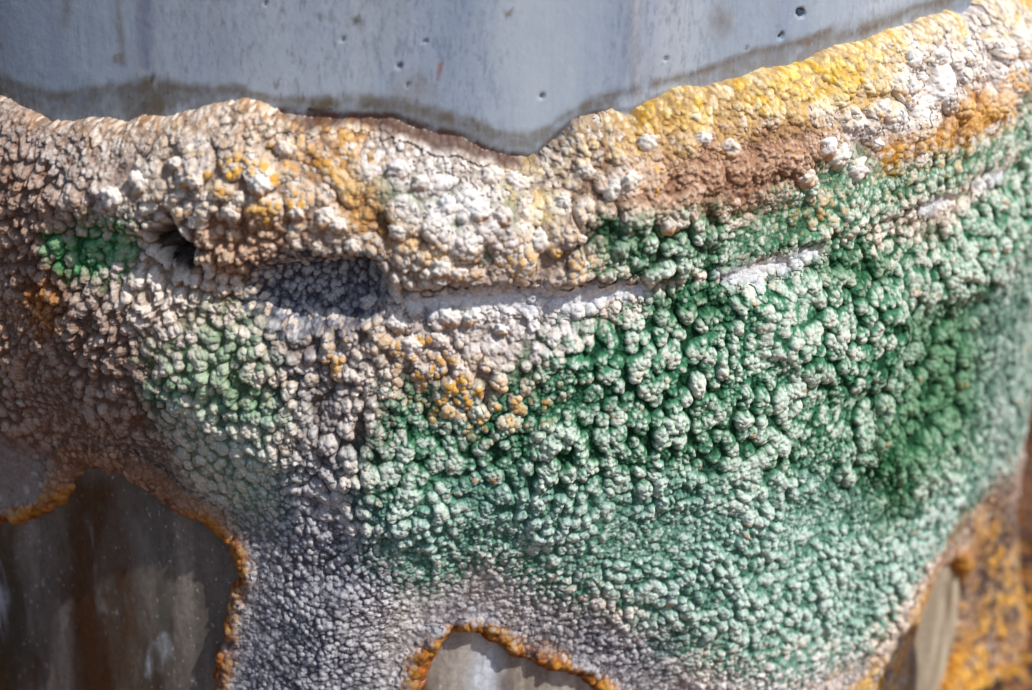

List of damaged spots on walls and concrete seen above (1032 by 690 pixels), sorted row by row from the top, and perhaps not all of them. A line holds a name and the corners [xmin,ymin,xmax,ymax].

leakage [433,193,458,215]
leakage [470,193,517,255]
leakage [253,342,266,361]
leakage [304,370,319,388]
leakage [317,333,347,384]
peeling [0,466,240,690]
peeling [907,563,960,690]
peeling [424,631,594,690]